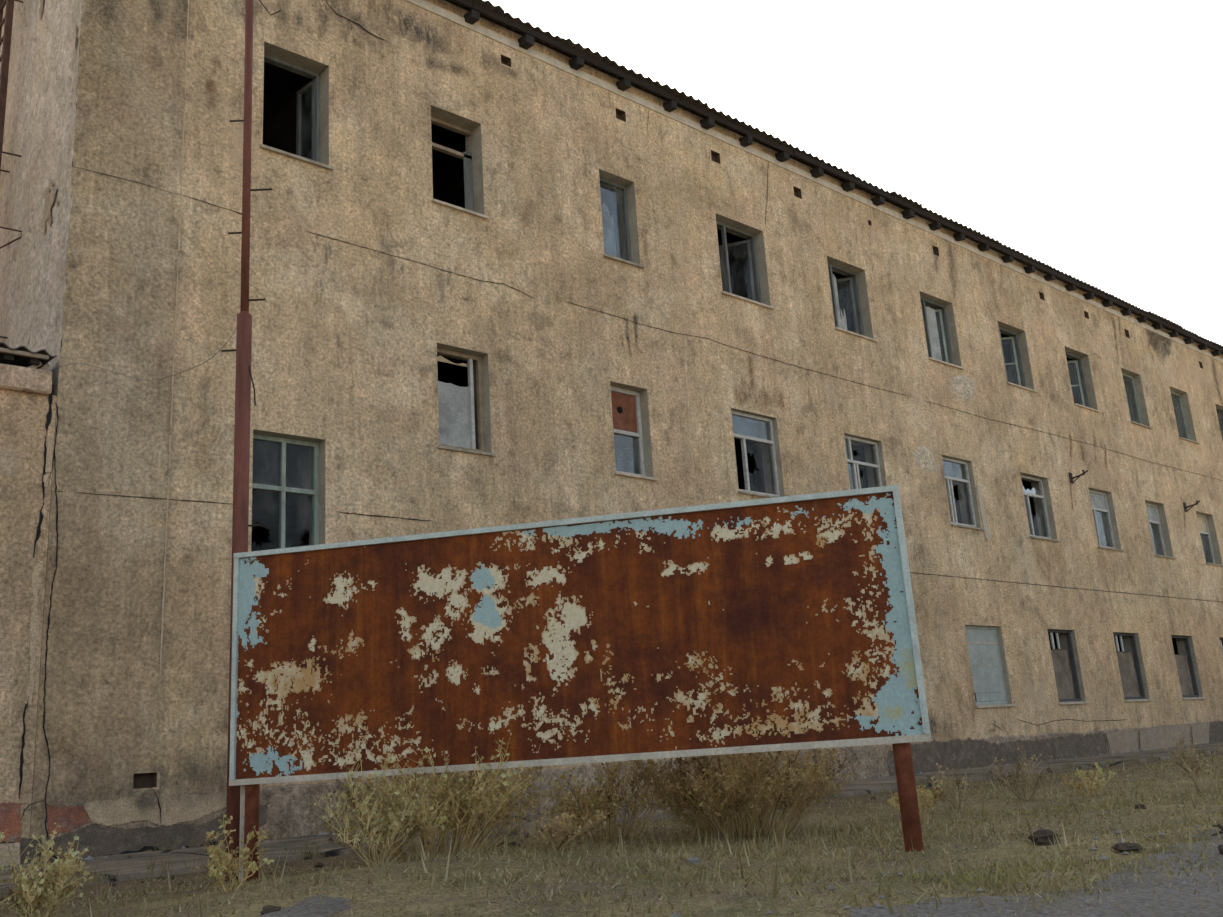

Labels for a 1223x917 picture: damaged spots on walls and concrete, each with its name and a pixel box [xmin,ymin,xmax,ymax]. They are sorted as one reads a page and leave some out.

crack [306,231,535,299]
crack [565,301,1223,481]
crack [0,0,251,859]
crack [339,511,431,521]
crack [910,572,1222,602]
spalling [0,791,227,866]